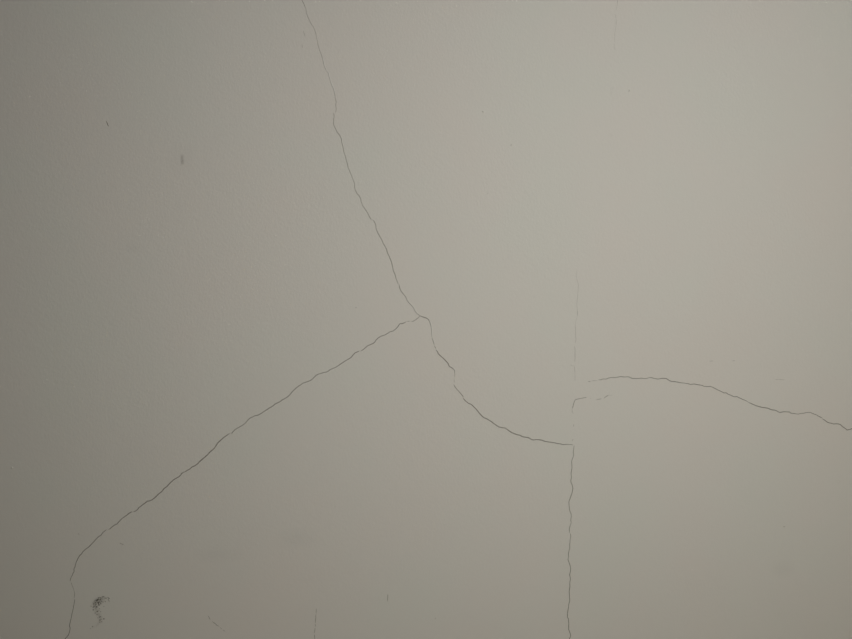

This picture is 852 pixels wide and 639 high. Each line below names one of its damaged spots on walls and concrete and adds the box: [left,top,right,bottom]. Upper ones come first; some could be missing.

crack [65,1,574,639]
crack [572,376,852,431]